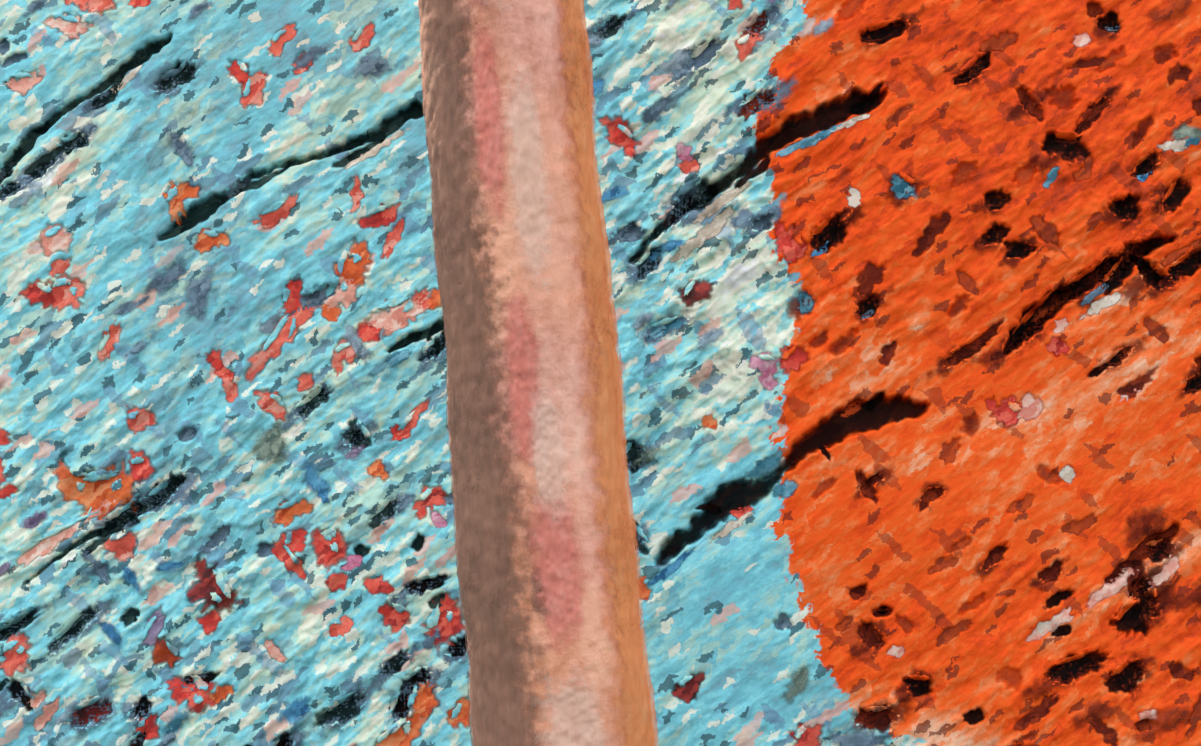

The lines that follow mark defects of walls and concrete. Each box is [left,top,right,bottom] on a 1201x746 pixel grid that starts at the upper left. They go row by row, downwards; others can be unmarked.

crack [0,38,172,183]
peeling [163,181,200,225]
crack [159,101,424,240]
crack [629,83,885,263]
crack [1005,237,1174,353]
crack [26,478,183,583]
peeling [17,450,197,567]
peeling [127,407,156,434]
spalling [178,428,196,441]
crack [657,392,927,565]
crack [0,612,35,640]